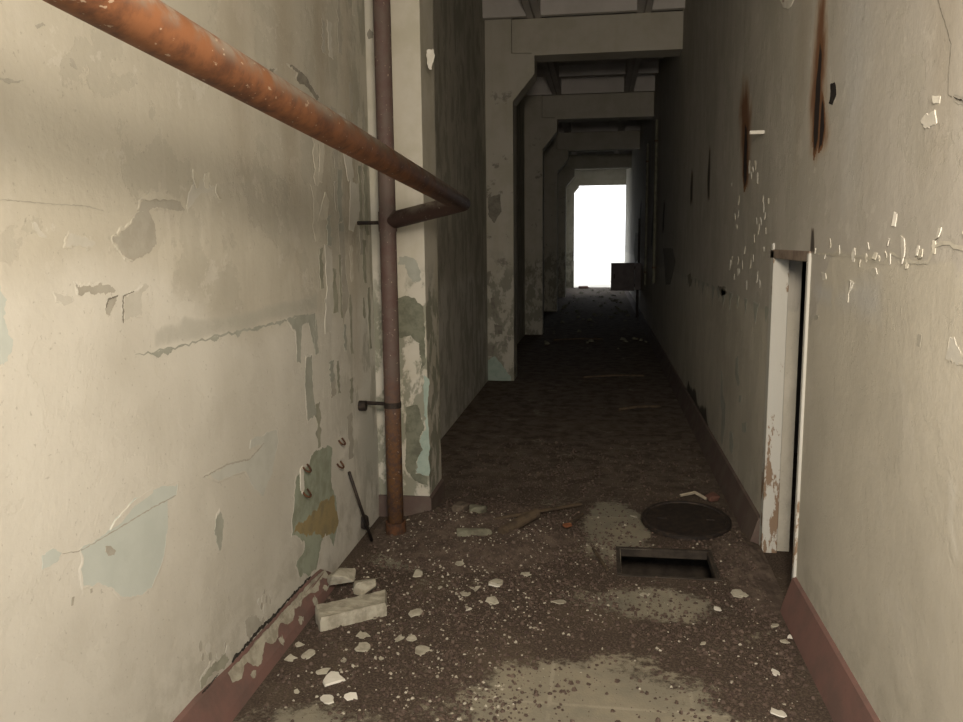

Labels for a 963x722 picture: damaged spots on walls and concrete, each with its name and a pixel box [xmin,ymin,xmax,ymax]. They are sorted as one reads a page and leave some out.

rust [736,58,755,204]
rust [804,0,836,176]
crack [938,0,963,105]
peeling [111,191,185,263]
peeling [815,212,963,277]
peeling [199,138,372,689]
peeling [398,296,430,486]
peeling [488,356,511,381]
peeling [42,481,179,606]